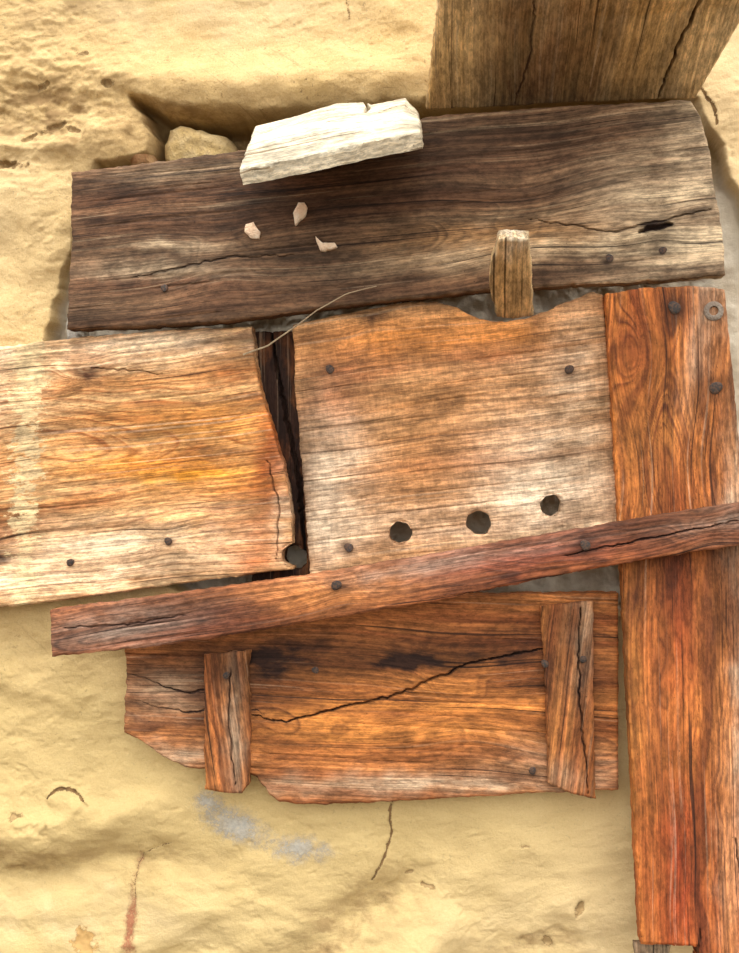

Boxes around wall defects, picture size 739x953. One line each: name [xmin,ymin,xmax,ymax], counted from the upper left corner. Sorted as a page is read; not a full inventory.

crack [371,801,393,880]